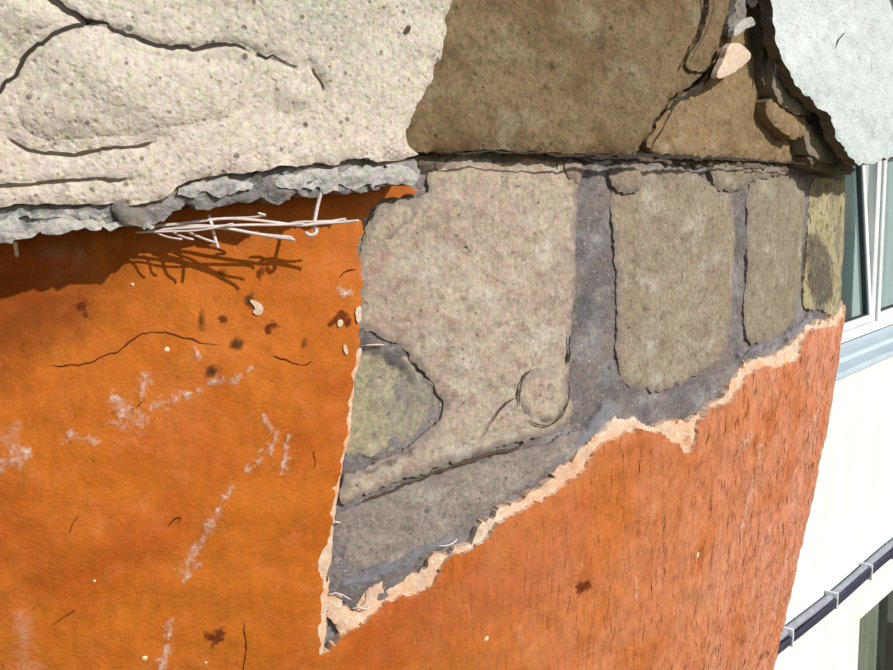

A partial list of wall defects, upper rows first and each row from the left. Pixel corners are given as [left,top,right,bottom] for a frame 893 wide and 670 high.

crack [0,0,324,94]
flaking render [0,158,420,243]
crack [51,331,217,367]
peeling [250,300,263,315]
flaking render [318,0,855,654]